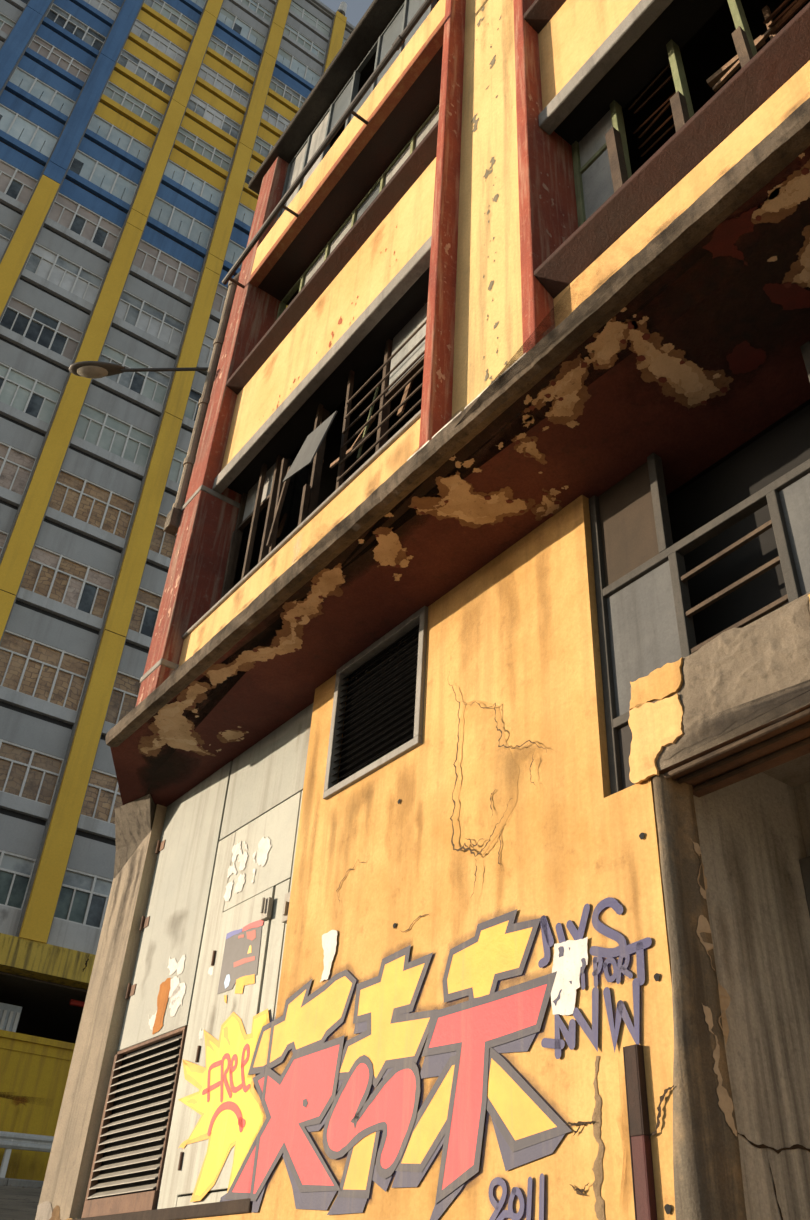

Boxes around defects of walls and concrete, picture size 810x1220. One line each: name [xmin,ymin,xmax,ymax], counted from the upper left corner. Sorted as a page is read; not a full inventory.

peeling [702,153,810,266]
peeling [763,225,810,310]
peeling [408,307,734,528]
peeling [358,512,414,581]
peeling [138,563,346,757]
crack [448,675,543,896]
spalling [628,594,810,792]
crack [649,1085,674,1139]
peeling [696,915,737,1136]